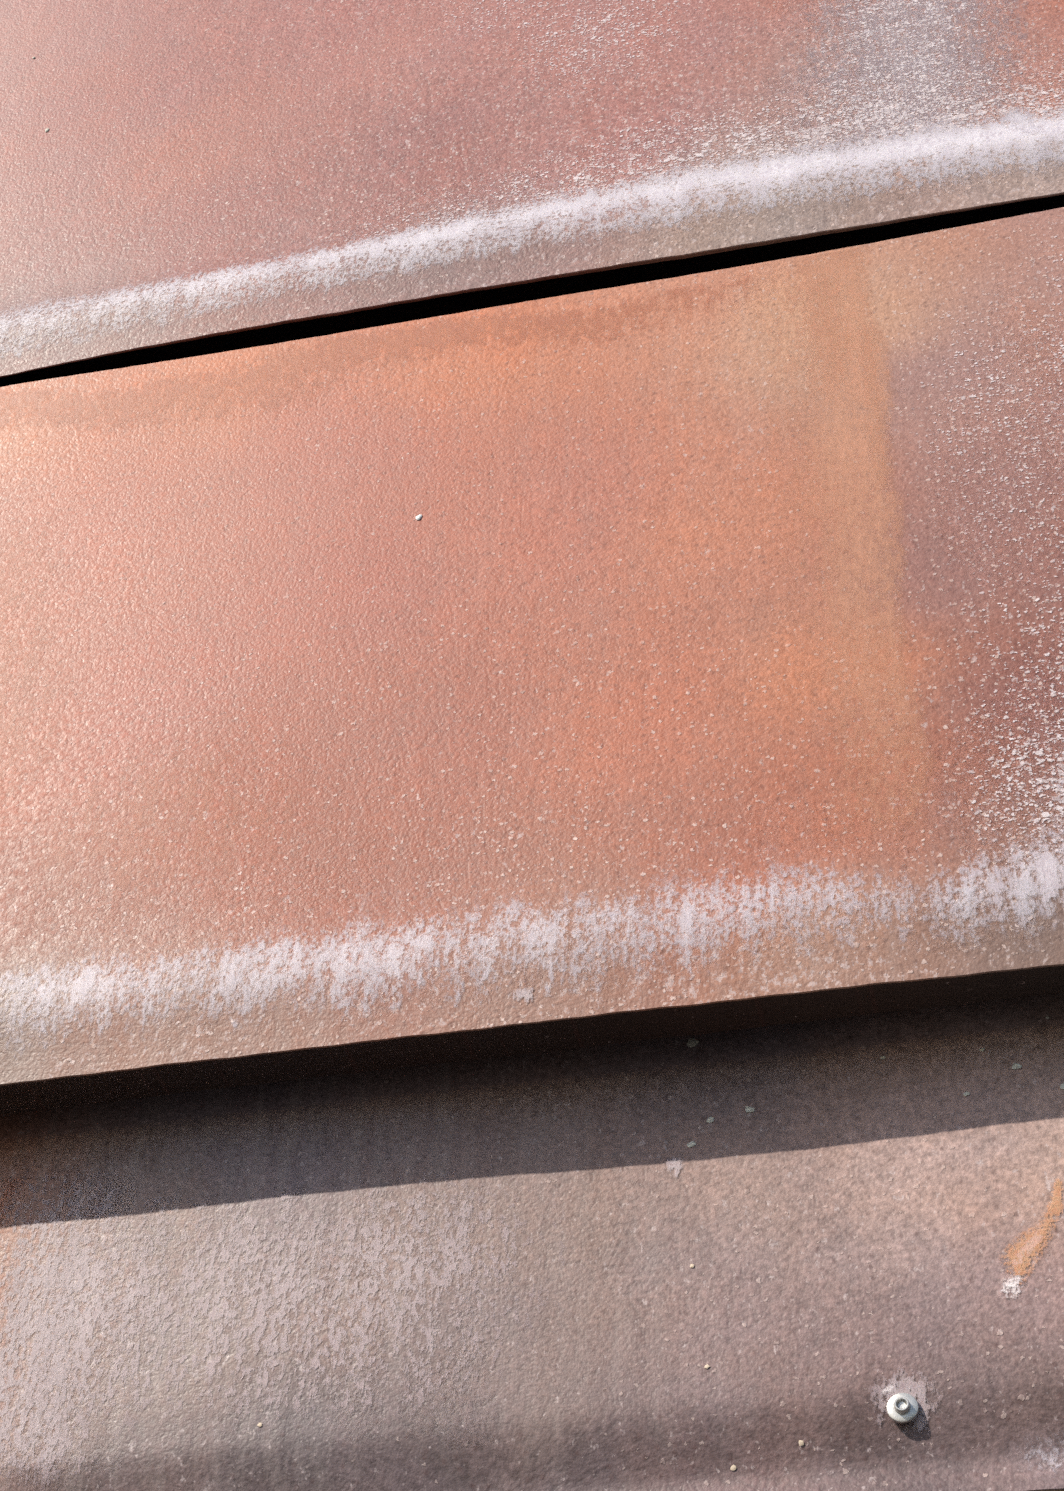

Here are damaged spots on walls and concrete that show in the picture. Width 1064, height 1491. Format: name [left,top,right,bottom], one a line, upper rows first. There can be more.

damp [0,236,1064,1049]
rust [1001,1179,1063,1298]